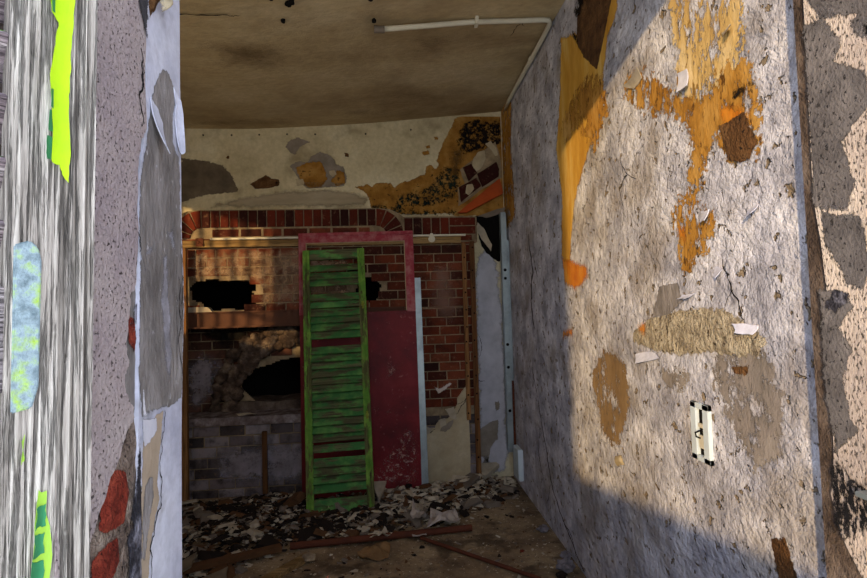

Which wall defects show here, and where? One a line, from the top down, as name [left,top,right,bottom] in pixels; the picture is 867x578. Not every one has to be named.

spalling [139,0,173,38]
peeling [560,0,611,153]
flaking render [250,175,279,189]
peeling [286,137,349,189]
peeling [357,103,516,262]
peeling [623,0,785,475]
peeling [801,0,867,453]
peeling [90,69,238,578]